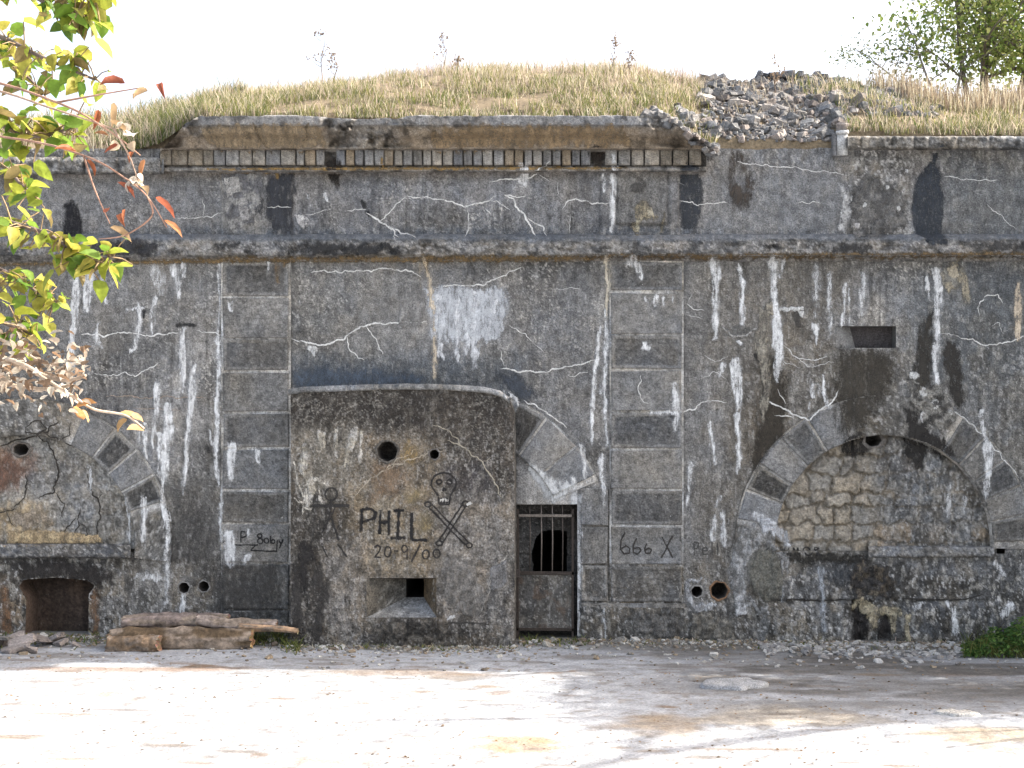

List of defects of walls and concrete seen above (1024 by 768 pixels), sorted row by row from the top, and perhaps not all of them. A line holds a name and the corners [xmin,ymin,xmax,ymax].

crack [267,161,608,241]
crack [293,321,427,360]
water stain [289,254,534,407]
water stain [709,257,721,341]
water stain [720,243,789,475]
water stain [811,264,866,345]
water stain [914,267,966,409]
crack [0,420,104,549]
water stain [125,264,329,641]
crack [355,425,502,499]
crack [524,400,567,428]
crack [769,391,838,421]